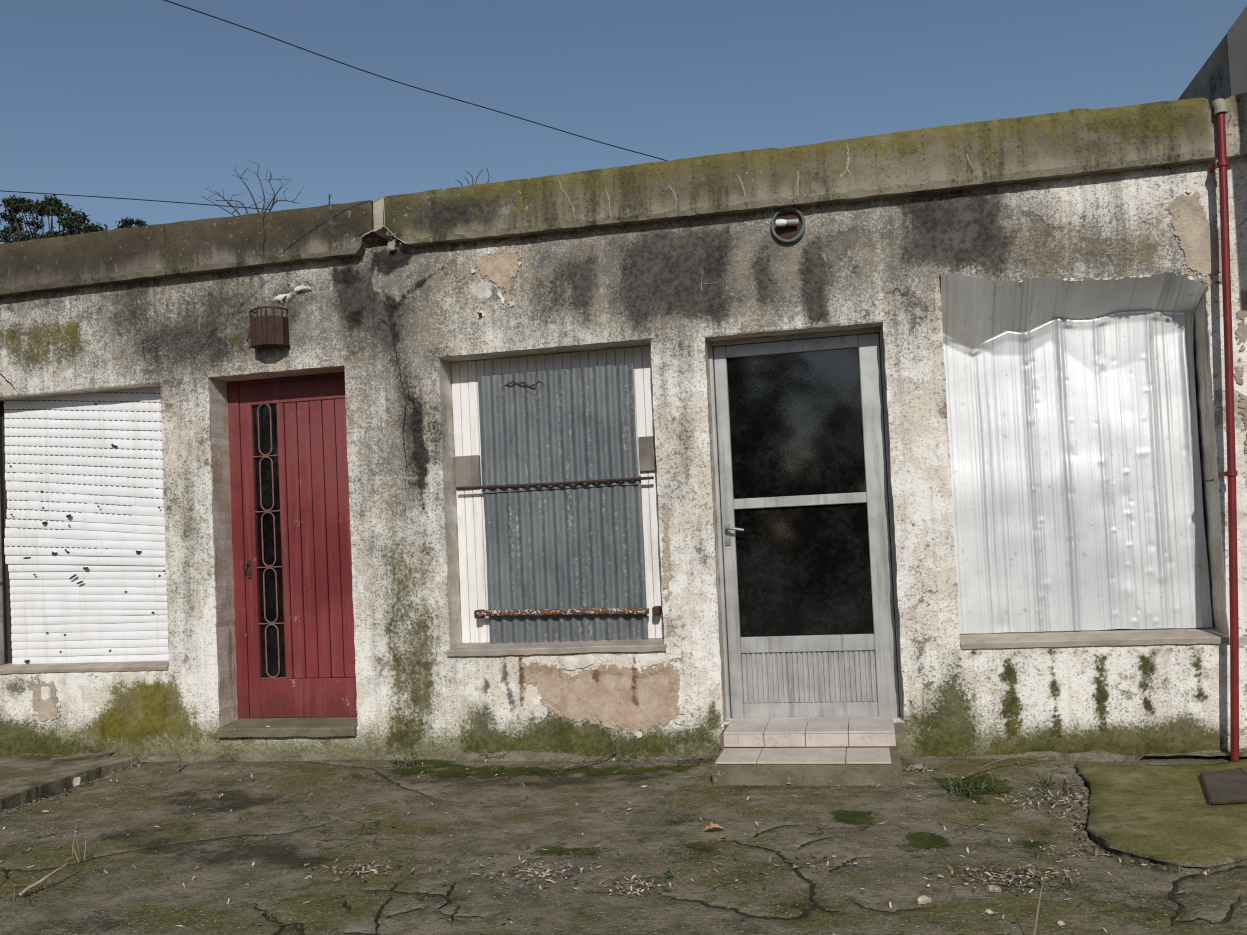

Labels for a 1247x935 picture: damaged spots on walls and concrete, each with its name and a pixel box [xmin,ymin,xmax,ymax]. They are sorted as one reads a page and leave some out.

damp [4,268,317,372]
peeling [470,249,522,307]
damp [751,241,778,304]
damp [798,235,832,326]
peeling [1164,188,1231,287]
damp [327,247,446,512]
peeling [1234,290,1247,453]
damp [138,681,170,737]
peeling [519,654,685,738]
damp [1000,648,1112,755]
damp [1129,648,1172,716]
damp [1191,645,1217,701]